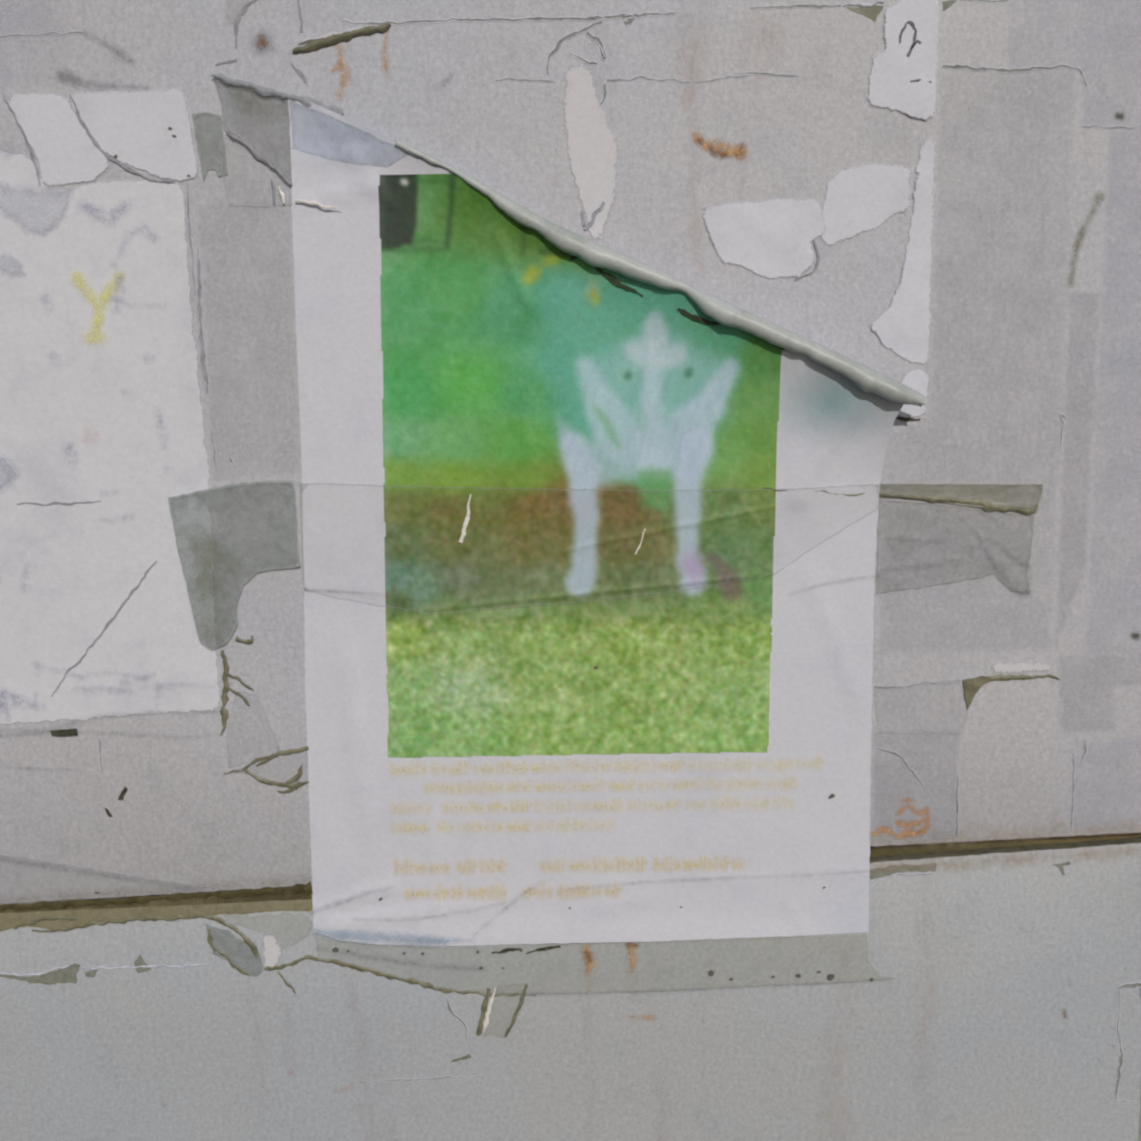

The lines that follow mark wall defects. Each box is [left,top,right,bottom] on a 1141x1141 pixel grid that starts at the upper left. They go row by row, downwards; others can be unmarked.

corrosion [694,134,745,159]
peeling [0,955,209,985]
crack [446,998,468,1044]